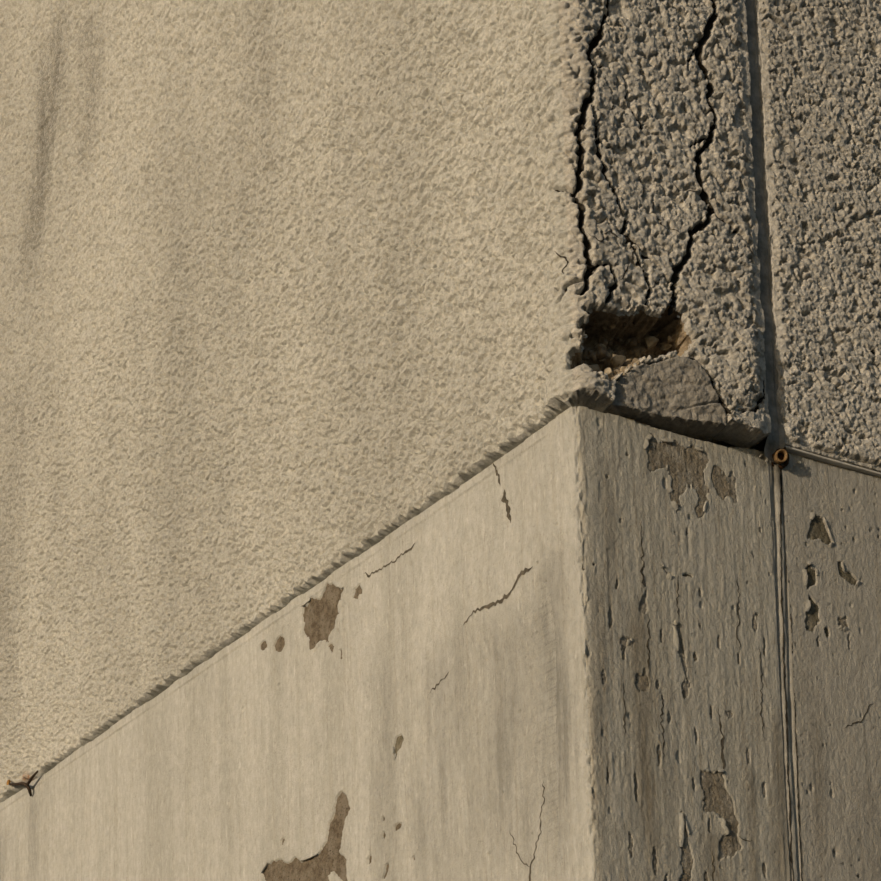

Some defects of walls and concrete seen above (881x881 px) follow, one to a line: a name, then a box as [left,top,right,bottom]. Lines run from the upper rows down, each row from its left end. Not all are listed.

crack [555,0,744,315]
spalling [570,304,737,519]
crack [690,358,765,415]
peeling [301,579,344,659]
crack [365,543,415,577]
crack [464,567,532,624]
crack [493,463,511,523]
crack [736,576,764,730]
peeling [807,512,836,548]
peeling [802,560,850,647]
peeling [261,792,351,881]
peeling [692,768,741,861]